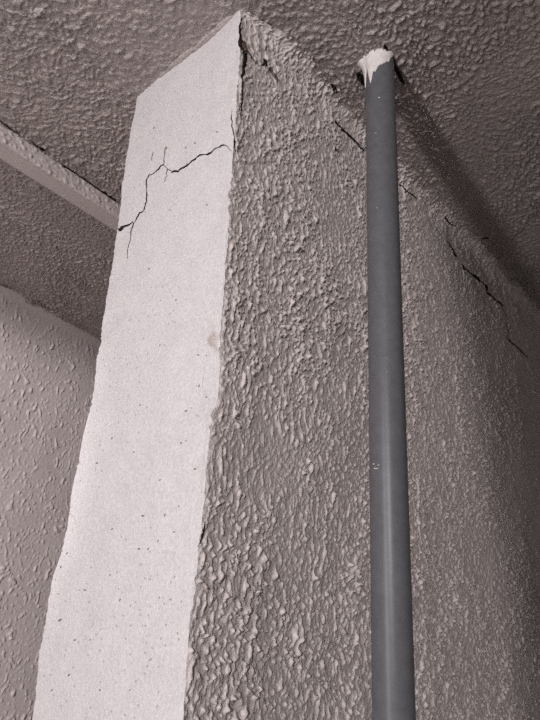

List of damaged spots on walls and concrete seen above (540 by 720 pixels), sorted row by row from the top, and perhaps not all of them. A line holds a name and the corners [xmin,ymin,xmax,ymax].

crack [118,17,257,259]
crack [335,120,364,153]
crack [444,216,528,357]